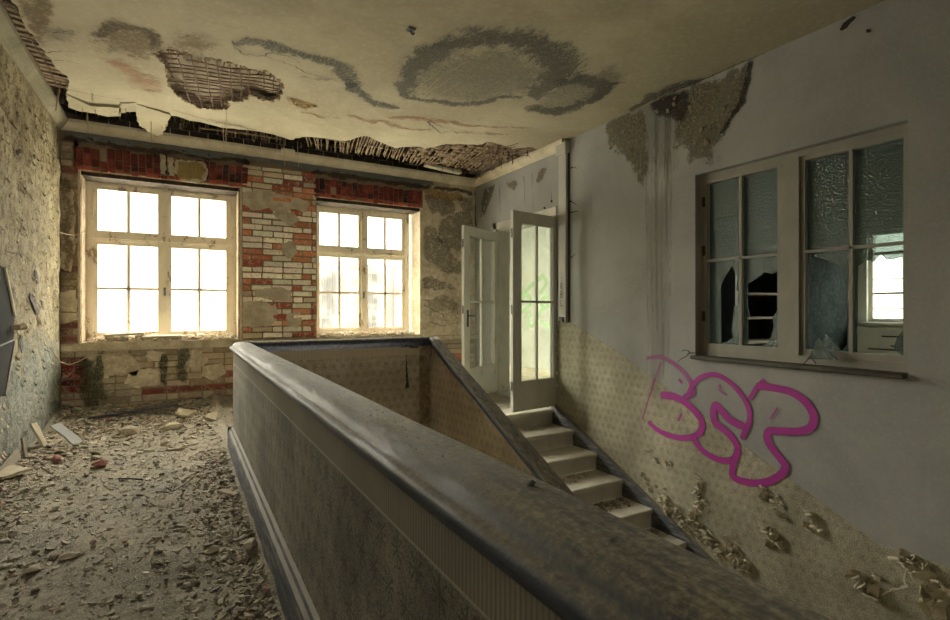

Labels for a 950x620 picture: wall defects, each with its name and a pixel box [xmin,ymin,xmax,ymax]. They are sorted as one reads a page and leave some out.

spalling [153,49,284,137]
leakage [234,26,617,116]
spalling [606,60,752,184]
flaking render [0,63,233,438]
flaking render [242,160,316,339]
peeling [422,186,494,291]
flaking render [441,339,474,367]
peeling [640,472,750,571]
peeling [887,548,950,620]